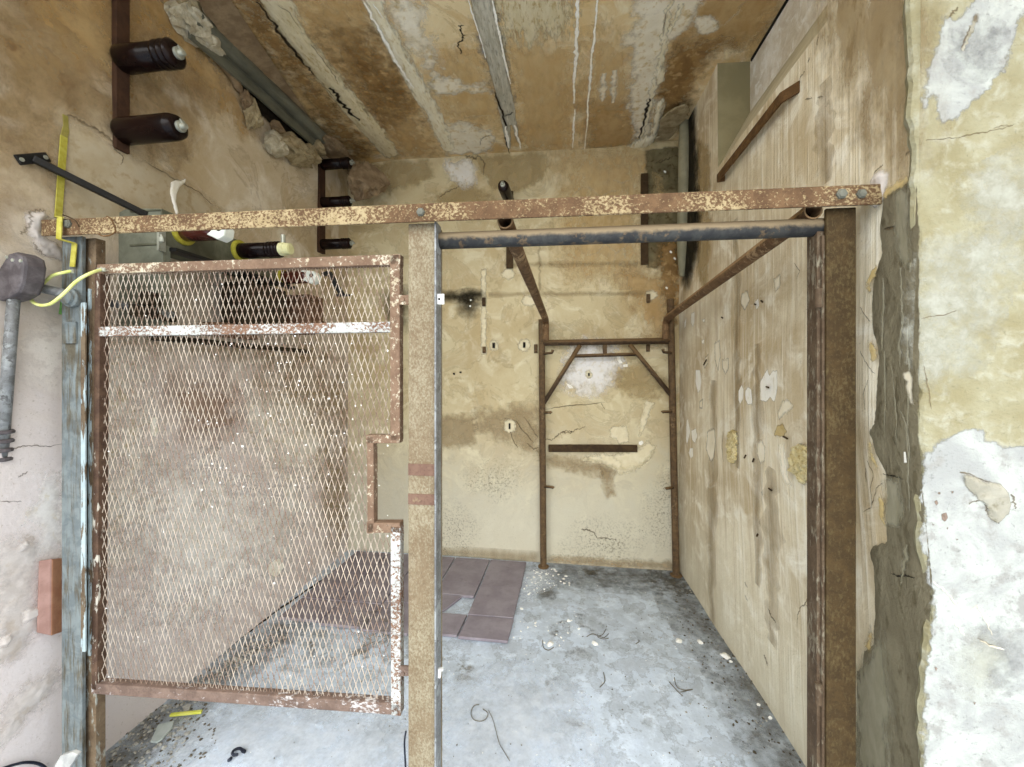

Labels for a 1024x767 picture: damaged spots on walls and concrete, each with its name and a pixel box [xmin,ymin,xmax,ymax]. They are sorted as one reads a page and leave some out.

peeling [921,0,1024,123]
crack [906,124,1014,154]
peeling [695,356,708,392]
peeling [904,372,912,402]
damp [442,410,539,452]
crack [548,402,605,441]
spalling [686,419,738,464]
spalling [739,370,807,484]
damp [549,456,607,473]
peeling [919,429,1024,767]